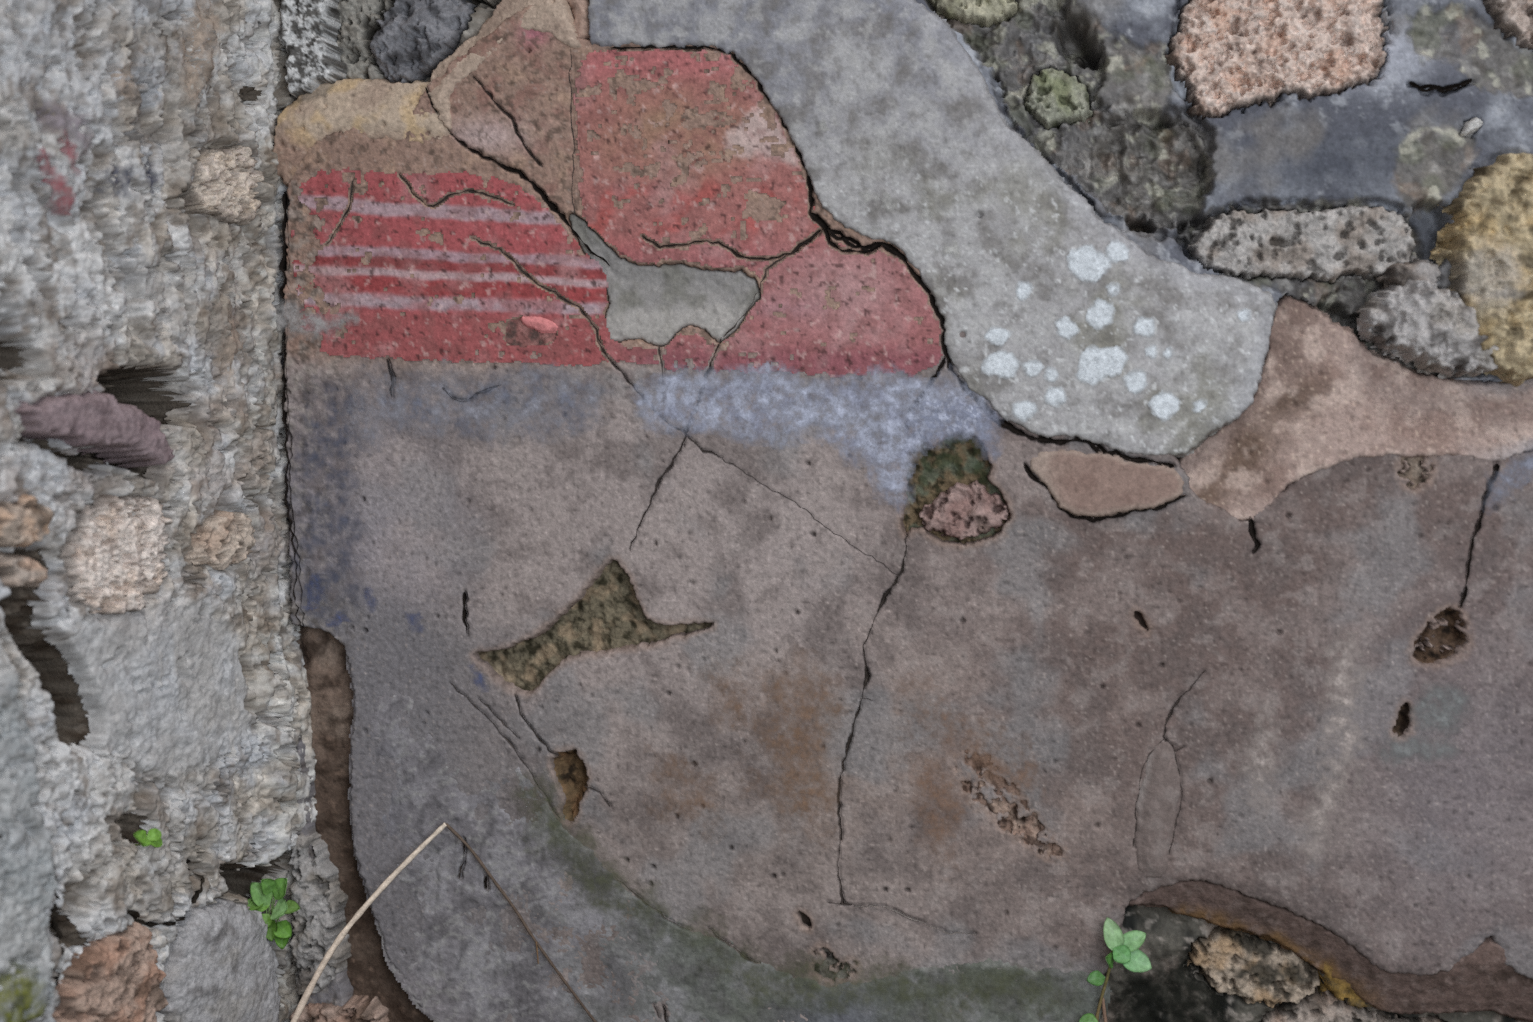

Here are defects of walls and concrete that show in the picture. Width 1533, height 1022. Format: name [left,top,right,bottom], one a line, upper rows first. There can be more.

crack [399,47,610,266]
crack [325,178,354,245]
crack [471,45,1186,935]
spalling [1397,457,1432,489]
crack [461,592,469,629]
spalling [478,560,712,691]
spalling [1413,606,1466,663]
crack [451,683,561,819]
spalling [554,750,589,821]
spalling [962,750,1062,856]
spalling [1393,702,1410,737]
crack [459,843,487,889]